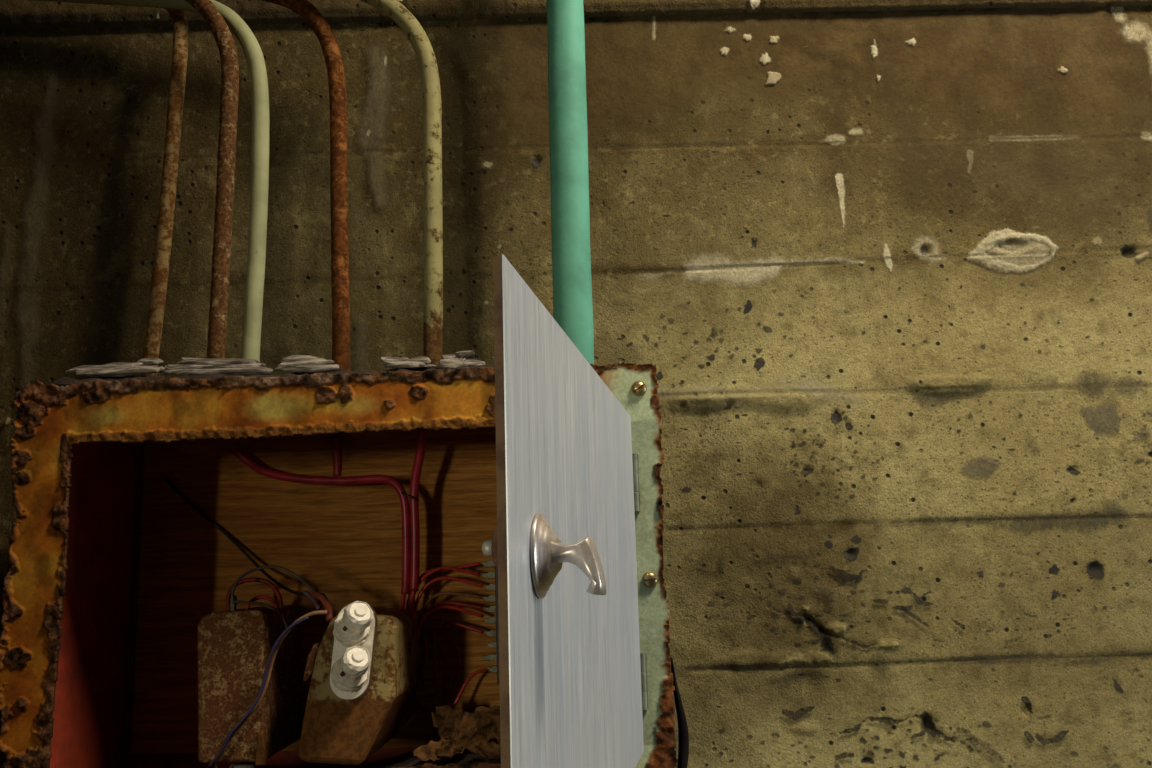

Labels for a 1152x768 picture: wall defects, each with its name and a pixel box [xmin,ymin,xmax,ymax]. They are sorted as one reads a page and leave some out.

leakage [968,229,1057,272]
leakage [877,506,1124,533]